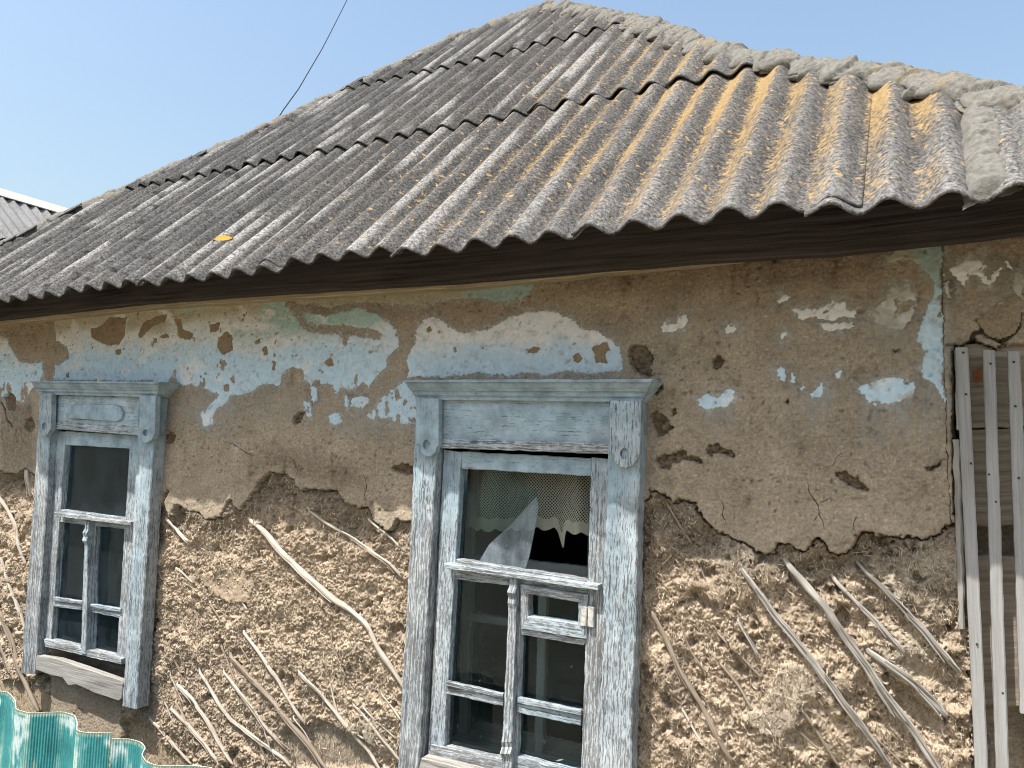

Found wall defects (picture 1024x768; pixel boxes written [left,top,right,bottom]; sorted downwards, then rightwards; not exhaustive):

peeling [0,284,654,430]
peeling [772,246,1024,411]
crack [919,246,1021,523]
crack [805,453,842,526]
spalling [837,471,869,491]
spalling [0,471,52,713]
spalling [49,648,73,658]
spalling [121,472,411,768]
spalling [637,491,974,768]